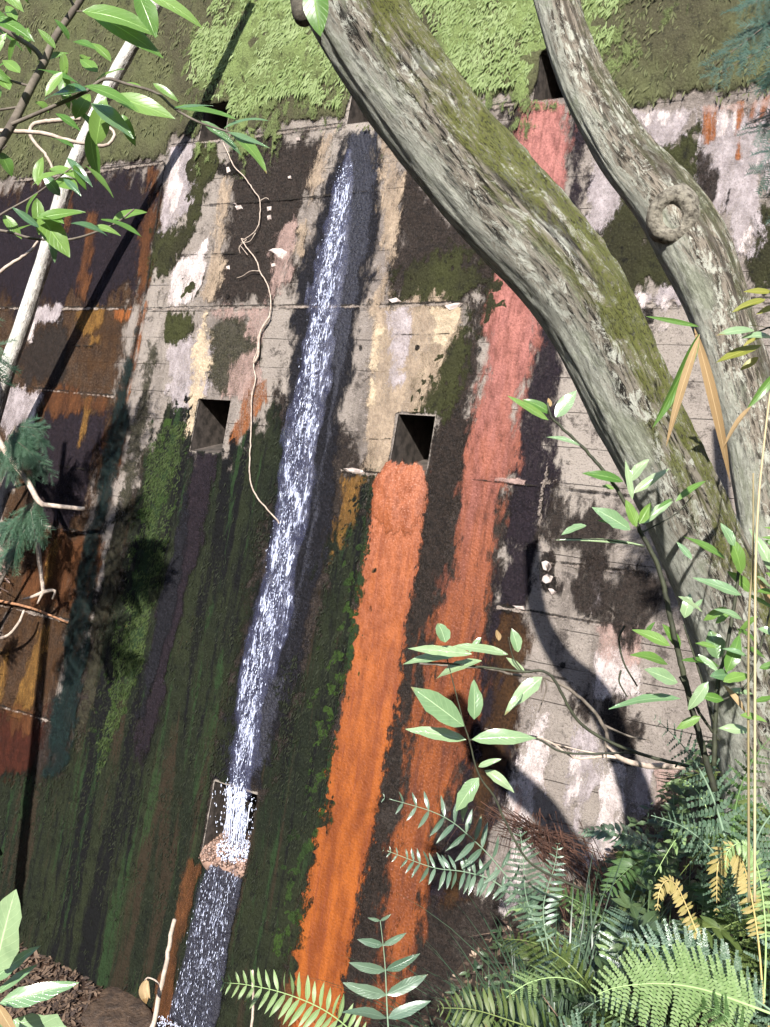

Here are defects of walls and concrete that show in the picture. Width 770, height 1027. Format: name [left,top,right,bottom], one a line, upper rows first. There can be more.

leakage [498,99,525,142]
corrosion [702,95,770,144]
leakage [12,446,157,802]
corrosion [0,160,172,787]
leakage [133,452,232,766]
corrosion [331,474,368,553]
leakage [164,120,681,1027]
corrosion [460,605,535,855]
corrosion [439,859,474,912]